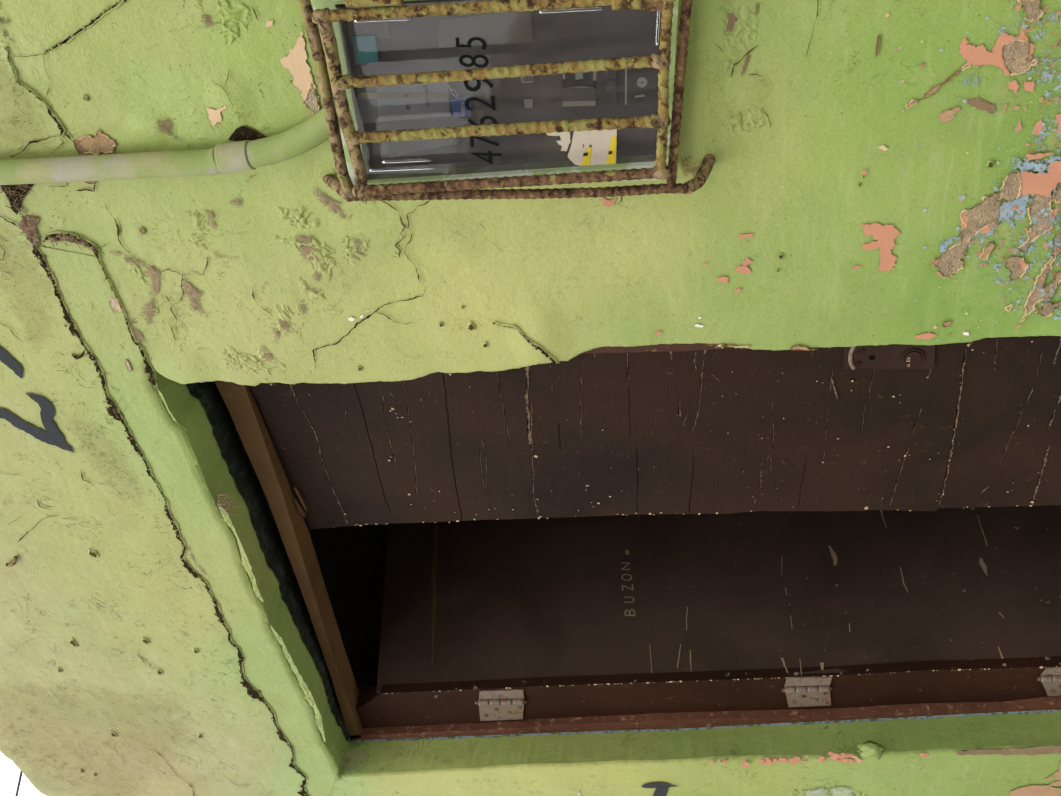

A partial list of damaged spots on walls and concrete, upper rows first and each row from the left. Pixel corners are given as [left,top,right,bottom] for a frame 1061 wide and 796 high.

crack [4,0,127,157]
spalling [280,32,321,114]
peeling [906,0,1061,322]
crack [312,200,429,367]
peeling [862,223,900,272]
crack [493,321,560,364]
peeling [915,320,951,340]
crack [0,182,311,796]
peeling [801,786,854,796]
peeling [954,745,1061,796]